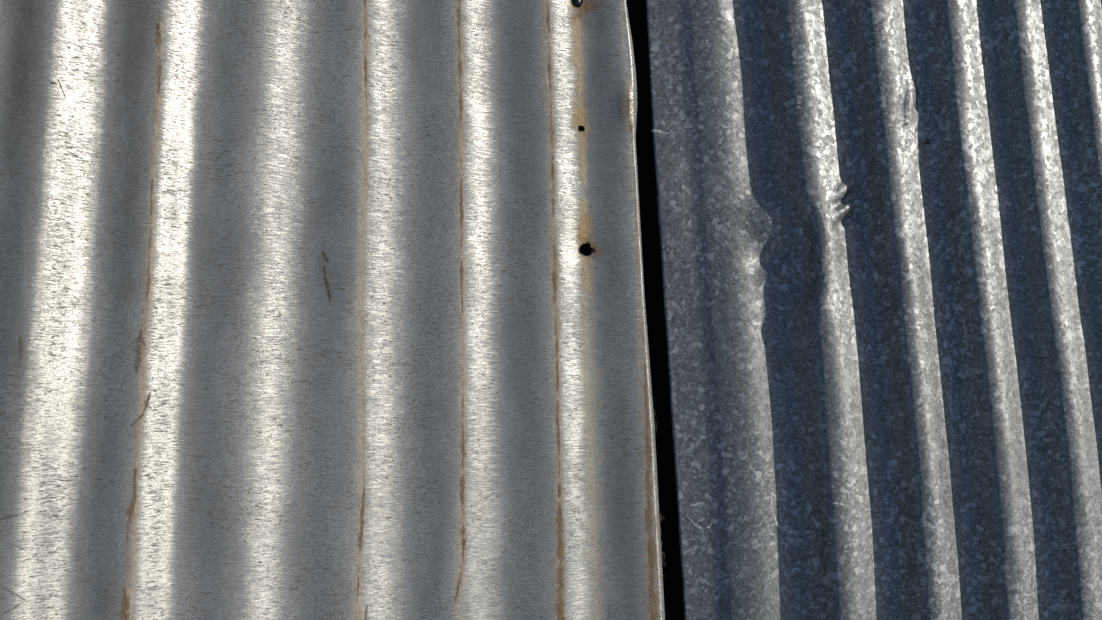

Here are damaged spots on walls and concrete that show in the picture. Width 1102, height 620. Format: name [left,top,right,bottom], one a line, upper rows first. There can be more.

rust [457,0,467,318]
rust [549,109,558,302]
rust [127,447,143,561]
rust [357,389,365,564]
rust [455,525,466,615]
rust [553,317,566,620]